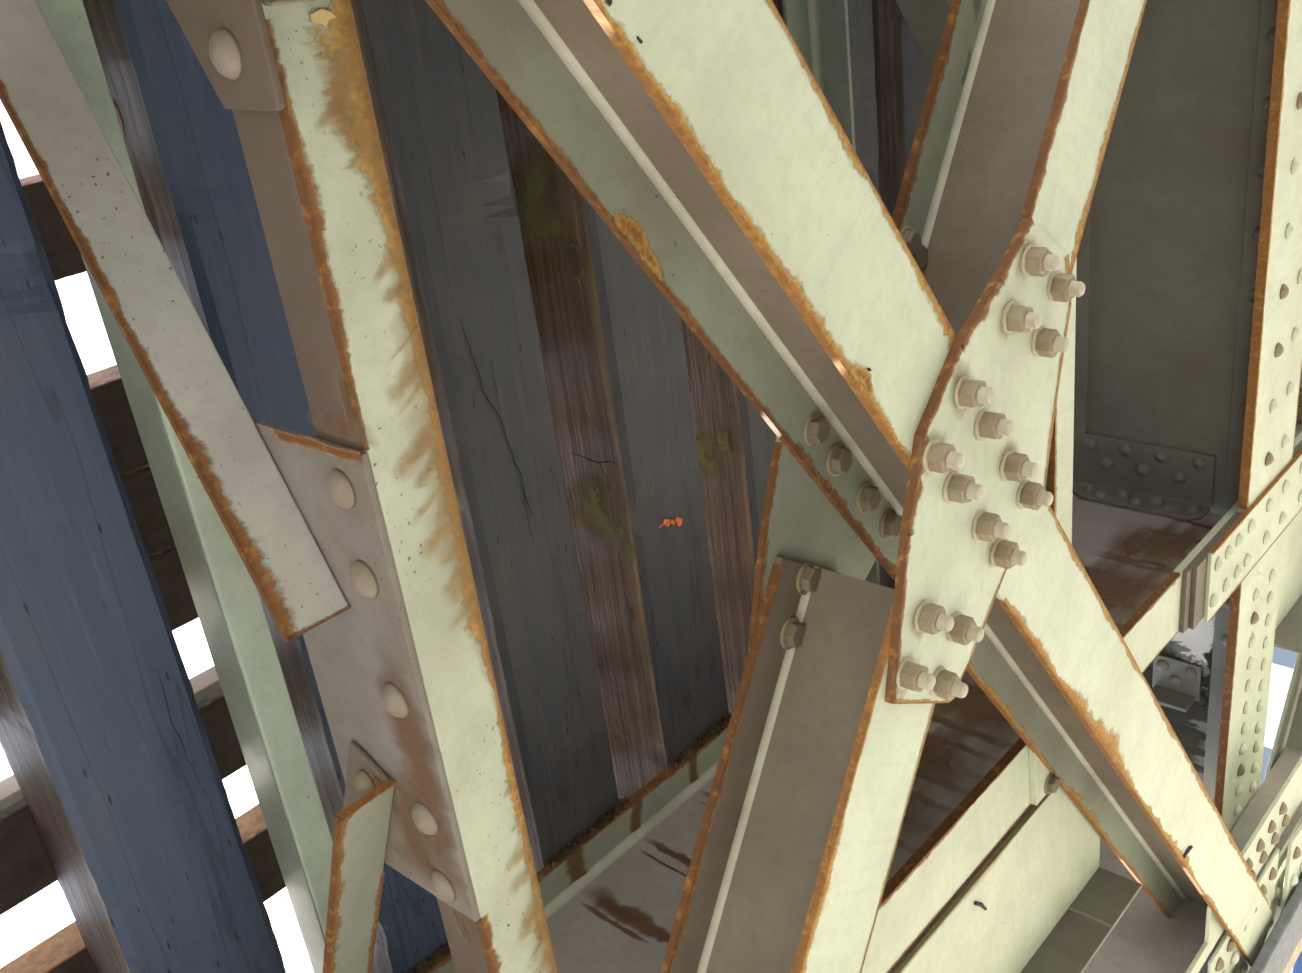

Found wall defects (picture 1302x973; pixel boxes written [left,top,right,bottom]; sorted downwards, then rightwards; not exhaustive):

corrosion [0,80,351,642]
corrosion [266,0,370,463]
crack [460,318,534,544]
corrosion [314,0,1253,973]
corrosion [1044,0,1302,915]